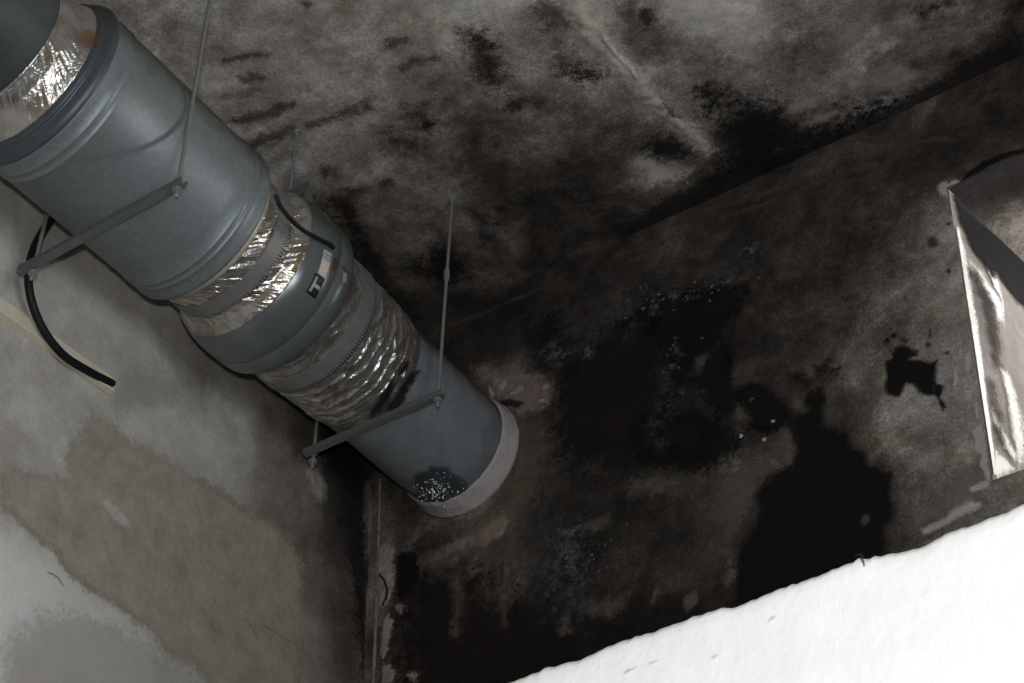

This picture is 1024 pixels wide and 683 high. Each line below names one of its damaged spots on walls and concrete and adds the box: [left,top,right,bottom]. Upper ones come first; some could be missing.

damp [457,28,515,90]
damp [523,1,609,81]
damp [226,102,296,149]
damp [608,0,1024,258]
damp [316,178,418,310]
damp [410,240,474,291]
damp [884,330,949,410]
damp [912,193,1024,526]
damp [414,466,468,502]
damp [532,278,894,604]
damp [2,420,304,683]
damp [391,504,670,683]